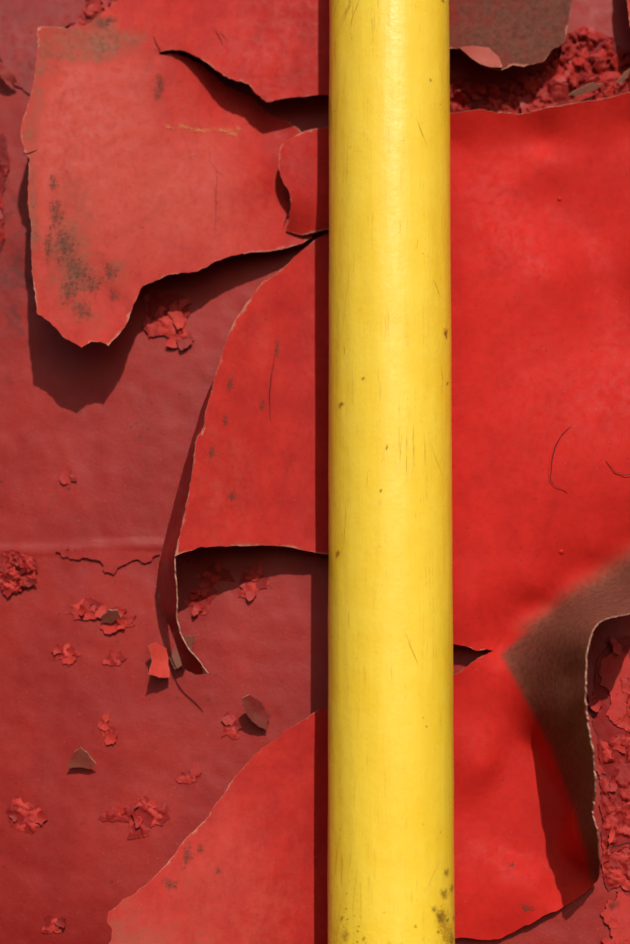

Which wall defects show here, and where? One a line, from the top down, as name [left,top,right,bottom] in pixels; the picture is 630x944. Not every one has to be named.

peeling [0,133,10,250]
peeling [20,0,329,678]
peeling [0,549,38,598]
peeling [449,0,630,940]
peeling [98,708,328,944]
peeling [221,695,270,739]